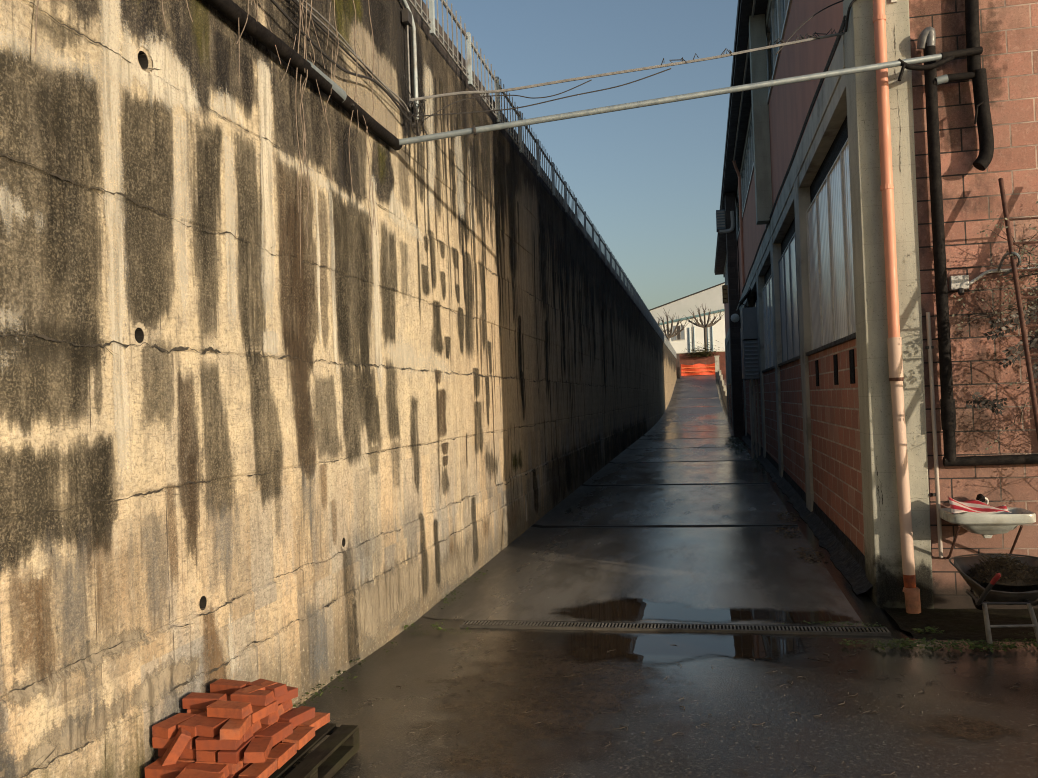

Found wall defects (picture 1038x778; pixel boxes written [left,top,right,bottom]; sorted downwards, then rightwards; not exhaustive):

crack [27,0,451,249]
crack [0,86,490,323]
water stain [0,0,677,645]
crack [0,333,645,778]